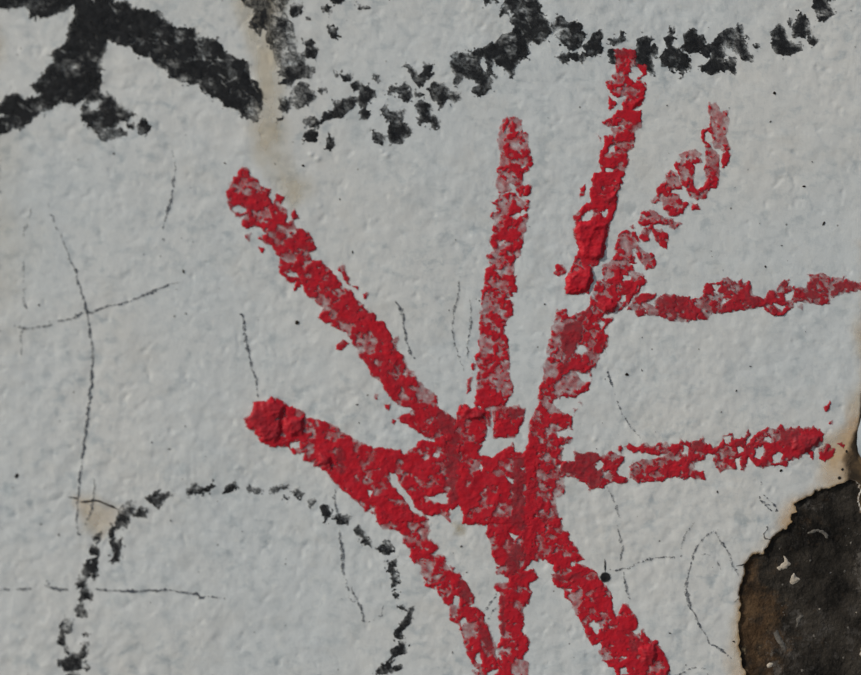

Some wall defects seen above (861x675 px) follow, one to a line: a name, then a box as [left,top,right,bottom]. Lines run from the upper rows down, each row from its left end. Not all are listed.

crack [69,497,118,510]
rust [828,432,861,507]